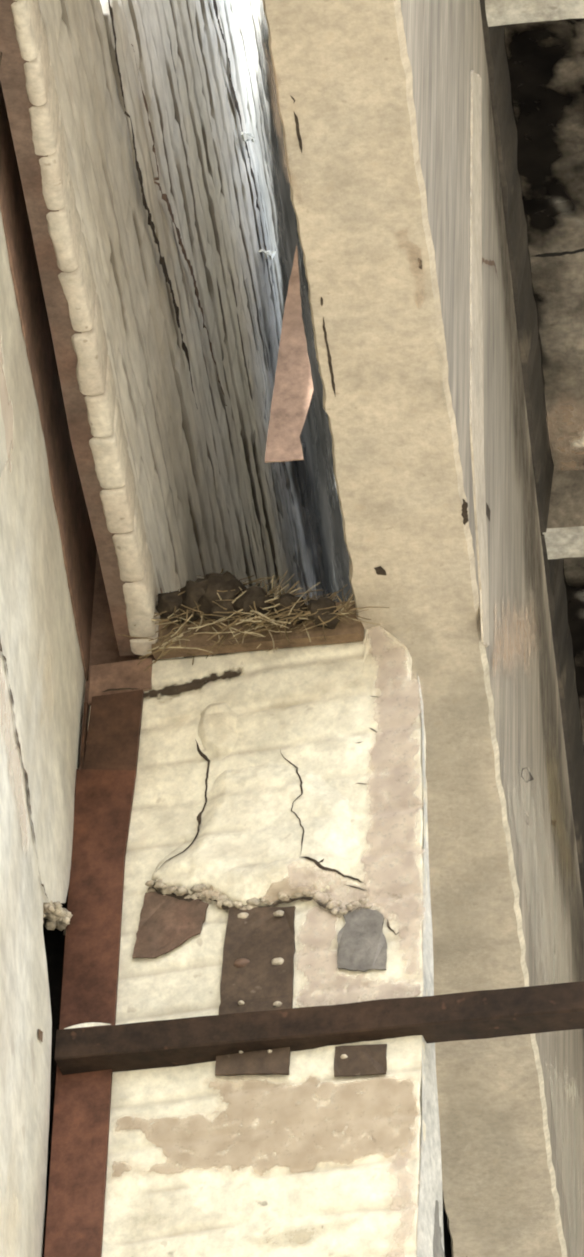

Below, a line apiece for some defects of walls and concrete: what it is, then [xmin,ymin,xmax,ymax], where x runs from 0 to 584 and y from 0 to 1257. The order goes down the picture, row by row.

crack [0,641,48,898]
peeling [145,626,424,1007]
crack [280,749,413,947]